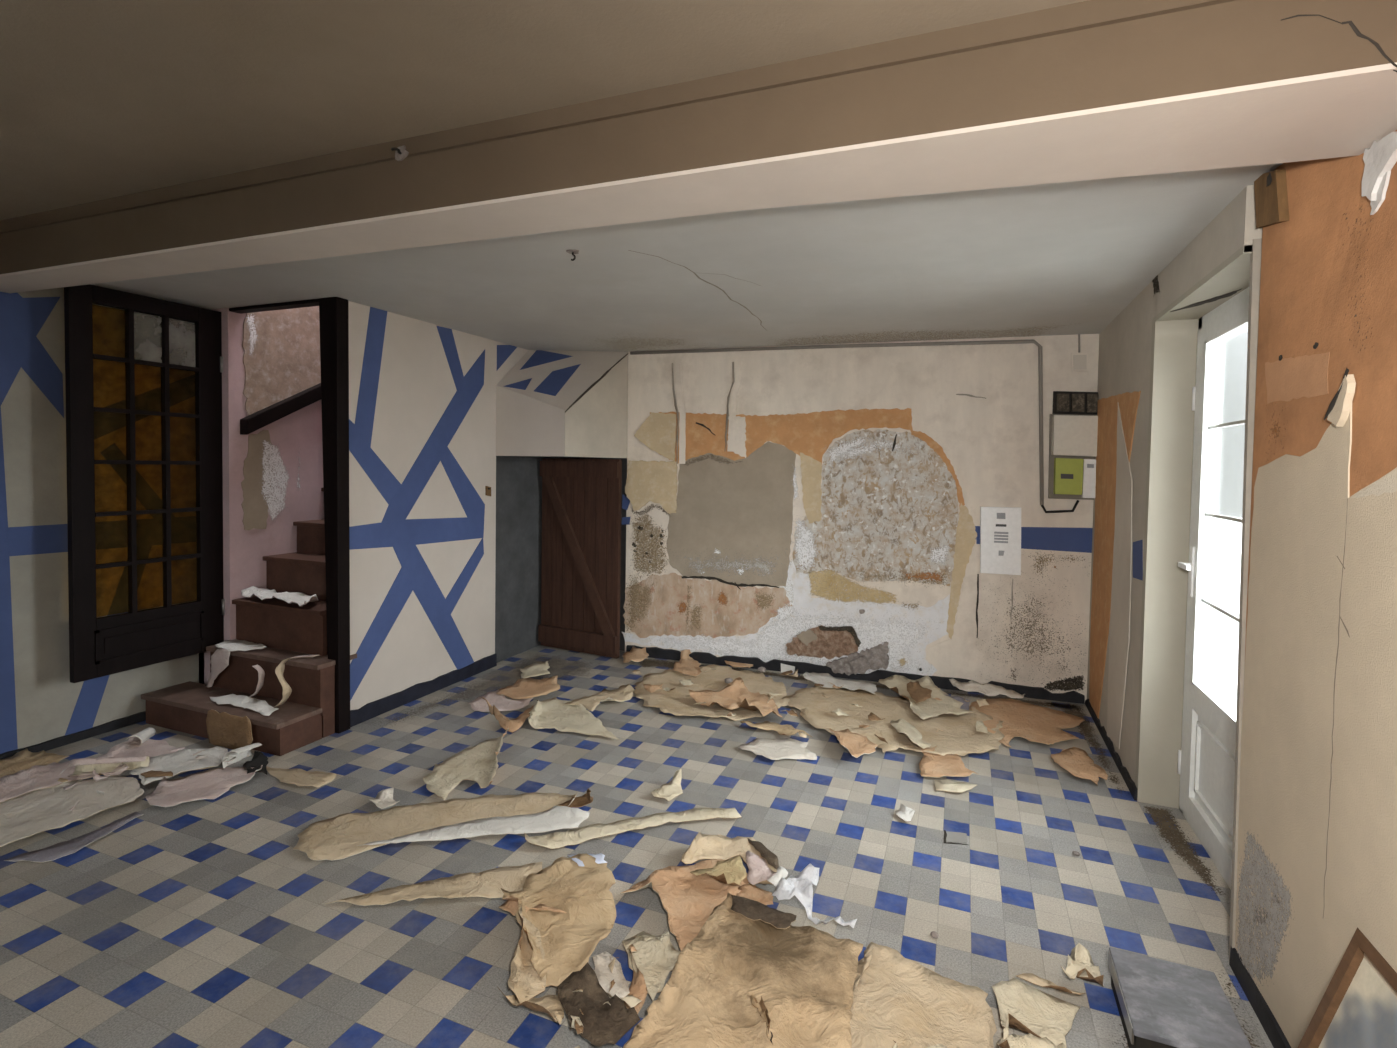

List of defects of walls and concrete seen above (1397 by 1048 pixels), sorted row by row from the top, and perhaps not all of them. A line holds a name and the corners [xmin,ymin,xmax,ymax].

crack [1281,15,1397,72]
spalling [1362,131,1397,215]
crack [628,250,766,330]
flaking render [623,429,959,638]
spalling [786,609,889,675]
leakage [981,547,1087,691]